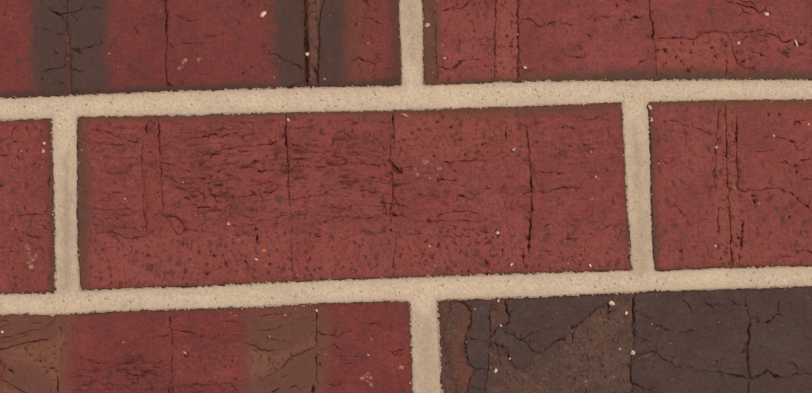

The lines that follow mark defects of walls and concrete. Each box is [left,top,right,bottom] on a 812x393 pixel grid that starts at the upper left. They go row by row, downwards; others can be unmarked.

crack [42,0,103,85]
crack [160,0,225,87]
crack [263,0,318,88]
crack [433,23,494,80]
crack [521,0,655,58]
crack [716,0,812,74]
crack [159,113,587,280]
crack [736,118,812,211]
crack [150,318,236,393]
crack [468,327,551,361]
crack [633,292,811,393]